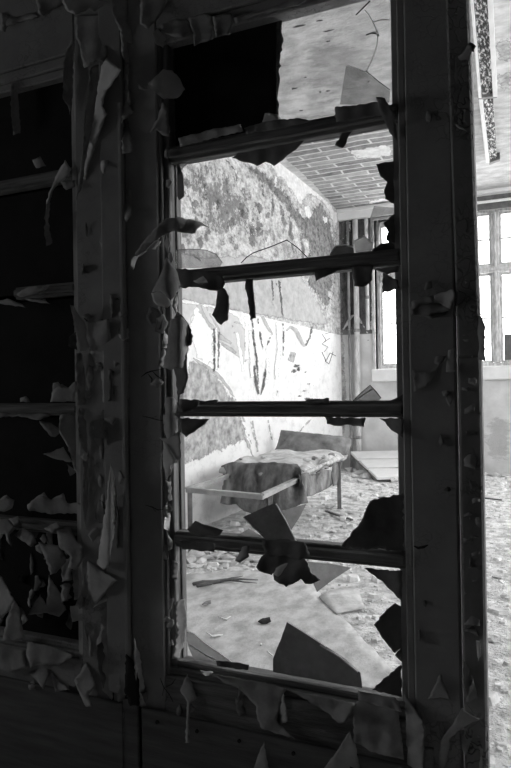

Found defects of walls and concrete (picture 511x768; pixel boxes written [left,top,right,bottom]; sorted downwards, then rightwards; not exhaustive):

peeling [160,0,306,46]
peeling [458,42,476,62]
peeling [0,285,50,308]
peeling [409,289,455,319]
peeling [477,316,486,361]
flaking render [130,172,330,587]
peeling [380,418,404,438]
peeling [0,305,125,707]
peeling [134,638,146,707]
peeling [200,568,483,768]
peeling [180,675,197,743]